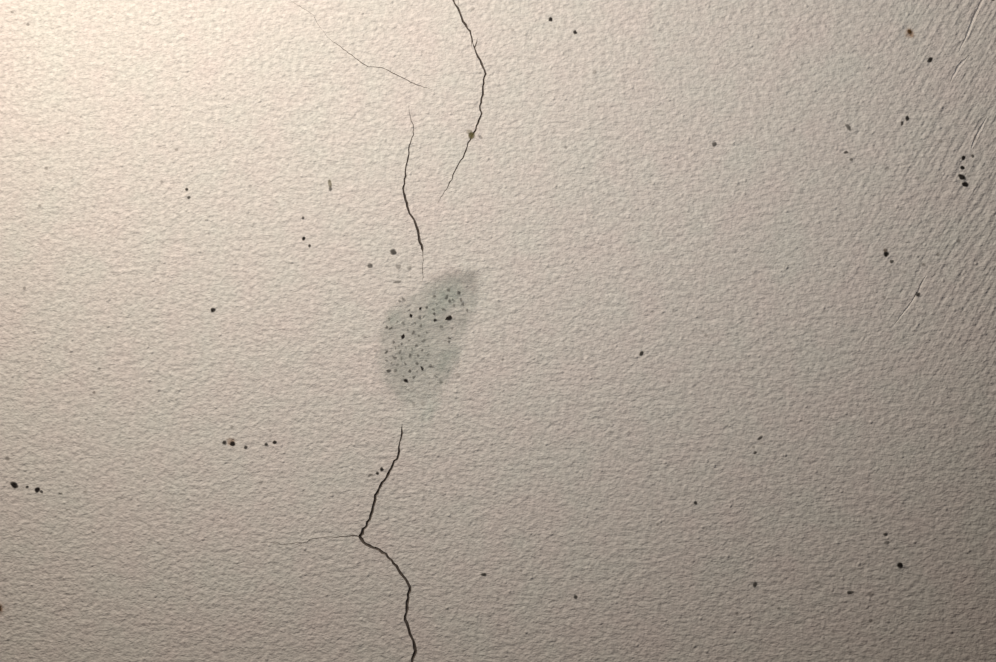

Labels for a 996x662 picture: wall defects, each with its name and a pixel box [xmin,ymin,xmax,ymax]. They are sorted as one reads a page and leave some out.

crack [402,112,424,280]
crack [438,0,487,202]
crack [270,427,417,662]